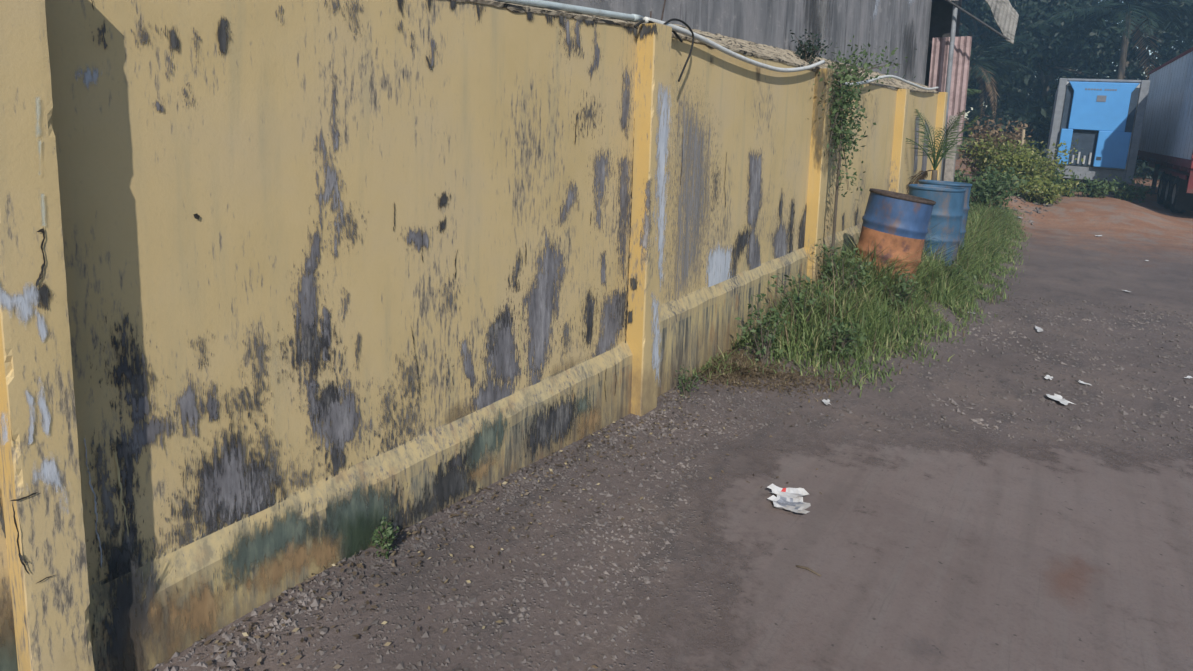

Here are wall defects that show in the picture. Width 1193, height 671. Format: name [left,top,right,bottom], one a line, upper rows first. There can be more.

peeling [131,19,180,77]
peeling [217,17,232,55]
peeling [426,39,437,70]
peeling [90,71,432,480]
peeling [401,191,451,261]
peeling [443,26,732,476]
water stain [727,148,807,280]
peeling [25,379,50,444]
crack [0,492,55,583]
peeling [33,459,67,499]
water stain [84,406,327,671]
water stain [321,451,483,563]